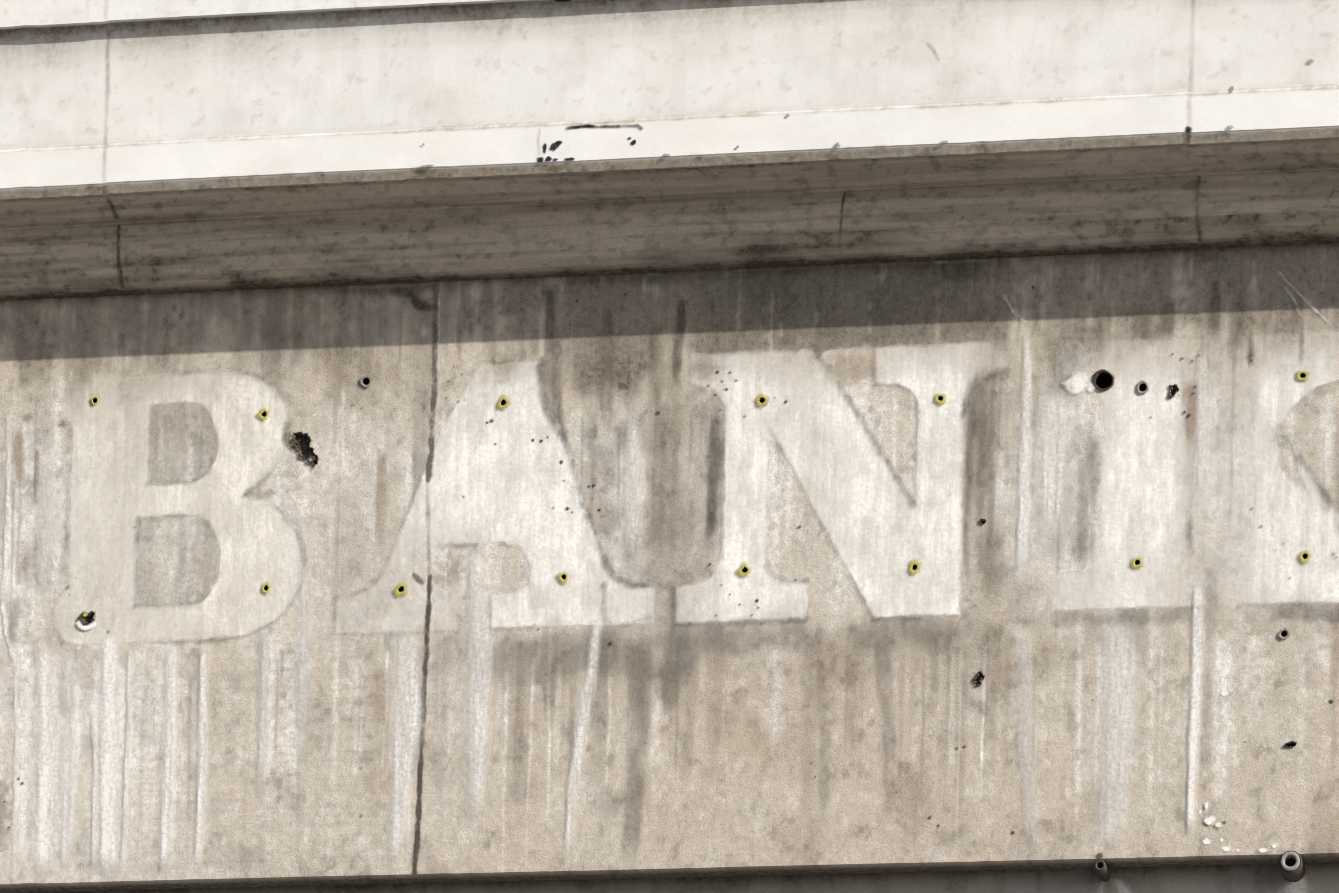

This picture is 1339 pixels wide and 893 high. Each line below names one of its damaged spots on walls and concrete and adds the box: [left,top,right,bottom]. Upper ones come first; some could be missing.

spalling [289,432,319,469]
crack [408,293,440,482]
leakage [1018,342,1095,558]
leakage [33,651,75,867]
leakage [92,635,132,865]
leakage [161,650,178,863]
leakage [195,651,207,862]
leakage [391,637,421,854]
crack [412,576,432,874]
leakage [469,557,492,807]
leakage [566,623,611,841]
leakage [1187,587,1203,827]